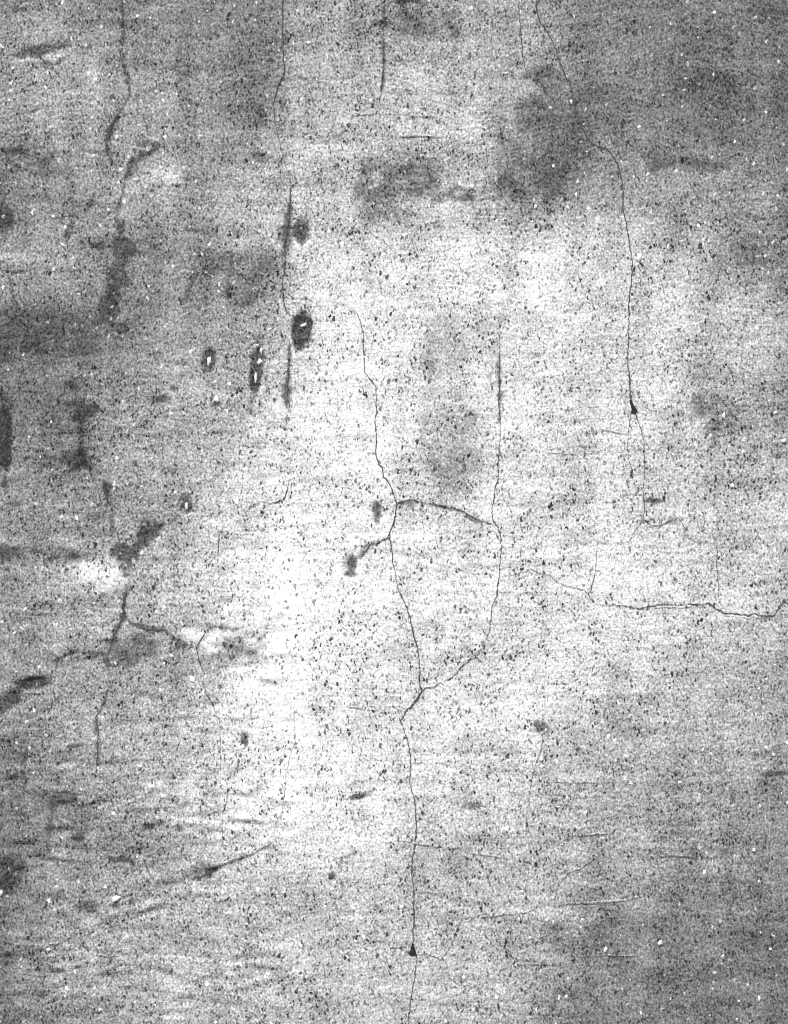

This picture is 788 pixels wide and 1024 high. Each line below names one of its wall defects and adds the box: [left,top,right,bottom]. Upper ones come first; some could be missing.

crack [104,0,130,302]
damp [498,172,527,199]
crack [357,0,788,1024]
crack [55,555,238,832]